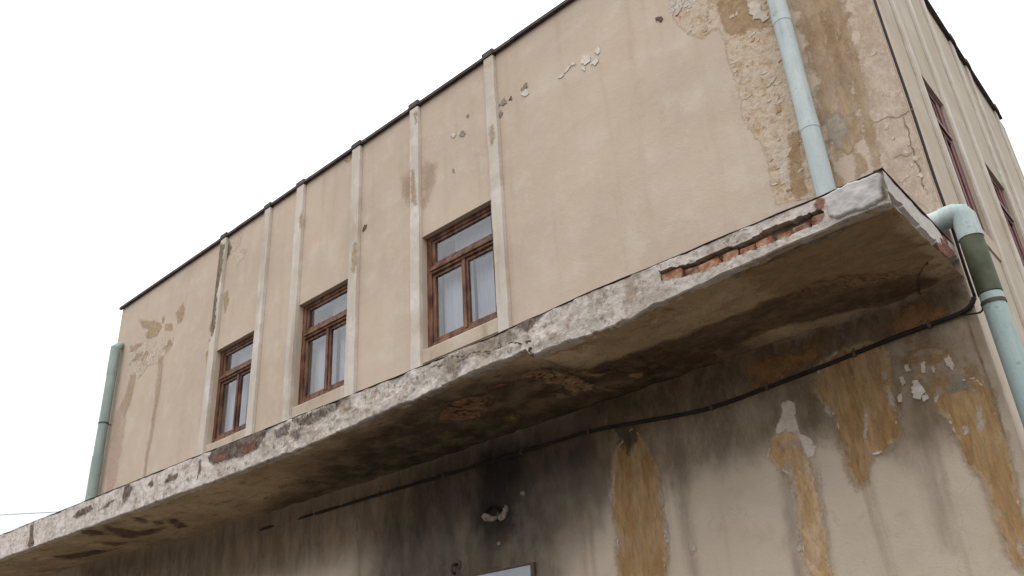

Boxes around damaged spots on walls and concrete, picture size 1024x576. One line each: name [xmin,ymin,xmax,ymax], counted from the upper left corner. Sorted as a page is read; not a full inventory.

peeling [655,0,846,281]
peeling [129,304,184,378]
flaking render [208,429,268,464]
spalling [481,504,509,522]
damp [54,212,976,576]
peeling [767,400,833,576]
peeling [813,340,1024,573]